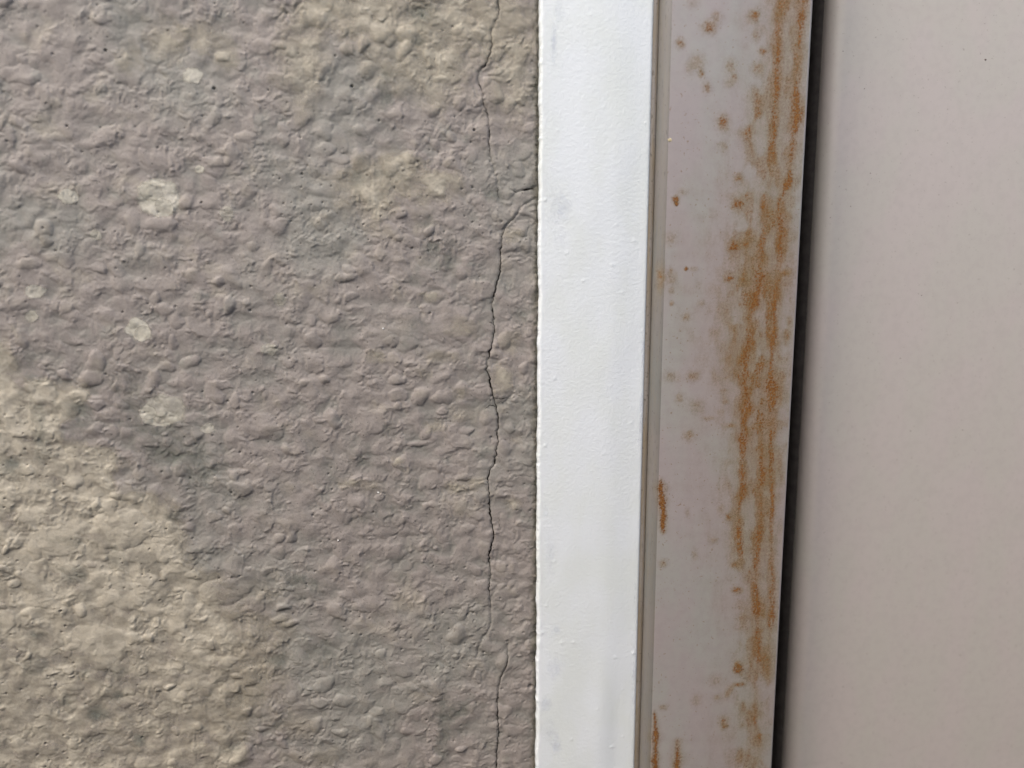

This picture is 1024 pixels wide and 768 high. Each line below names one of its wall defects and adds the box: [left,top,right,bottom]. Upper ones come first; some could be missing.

crack [478,4,534,635]
corrosion [724,0,808,690]
corrosion [657,480,667,533]
crack [495,652,508,767]
corrosion [651,713,659,768]